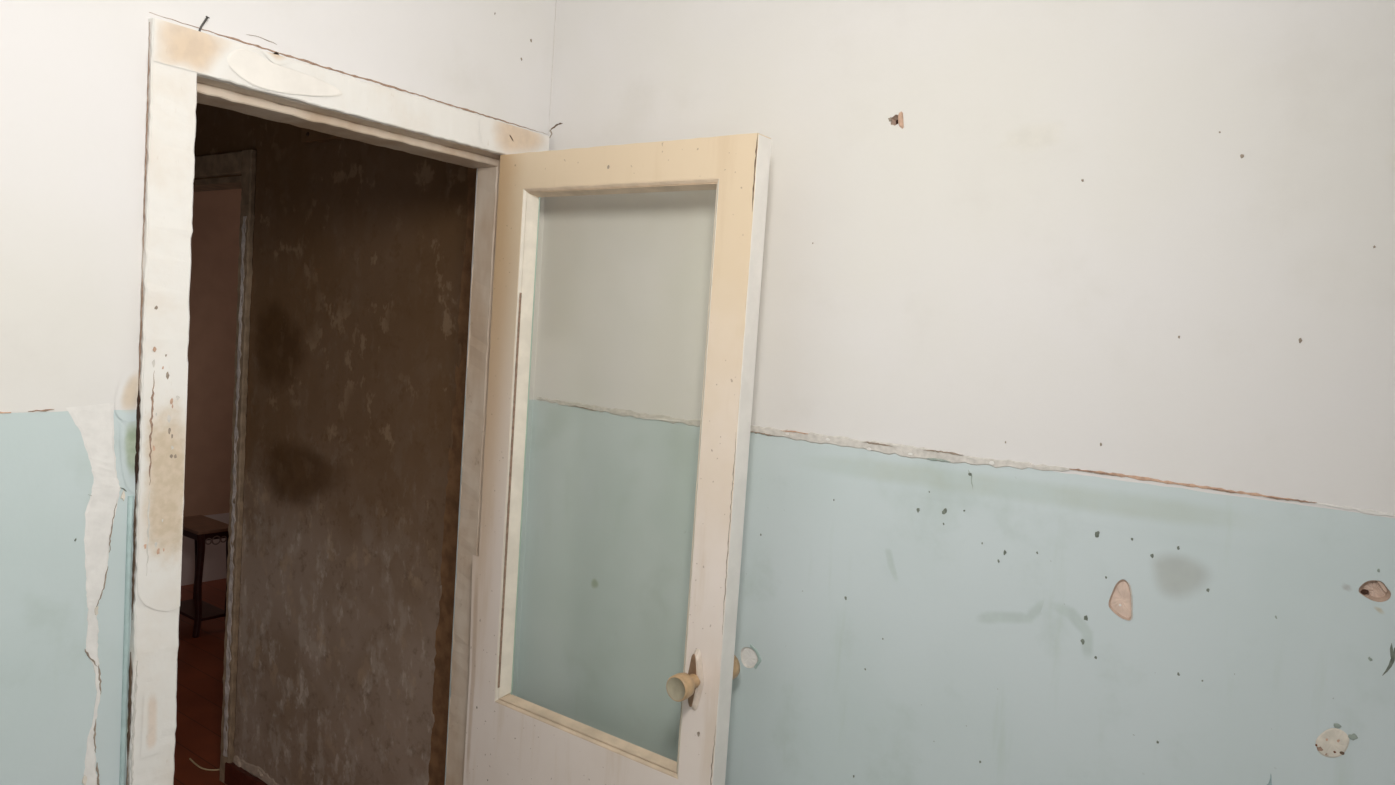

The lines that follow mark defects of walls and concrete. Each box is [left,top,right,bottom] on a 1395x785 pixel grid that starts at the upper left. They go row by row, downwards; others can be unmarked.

damp [244,272,380,531]
peeling [29,403,127,785]
spalling [1105,576,1133,621]
spalling [1332,569,1391,620]
peeling [1315,723,1358,758]